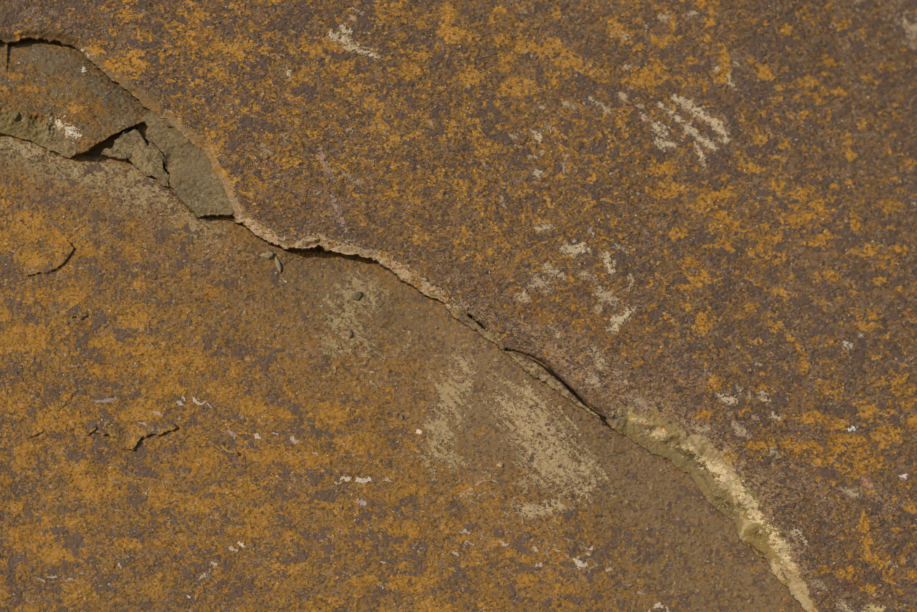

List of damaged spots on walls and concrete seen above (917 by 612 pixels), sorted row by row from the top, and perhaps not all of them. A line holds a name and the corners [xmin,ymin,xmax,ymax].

spalling [0,28,600,418]
peeling [70,423,177,451]
crack [442,295,609,423]
spalling [602,406,818,612]